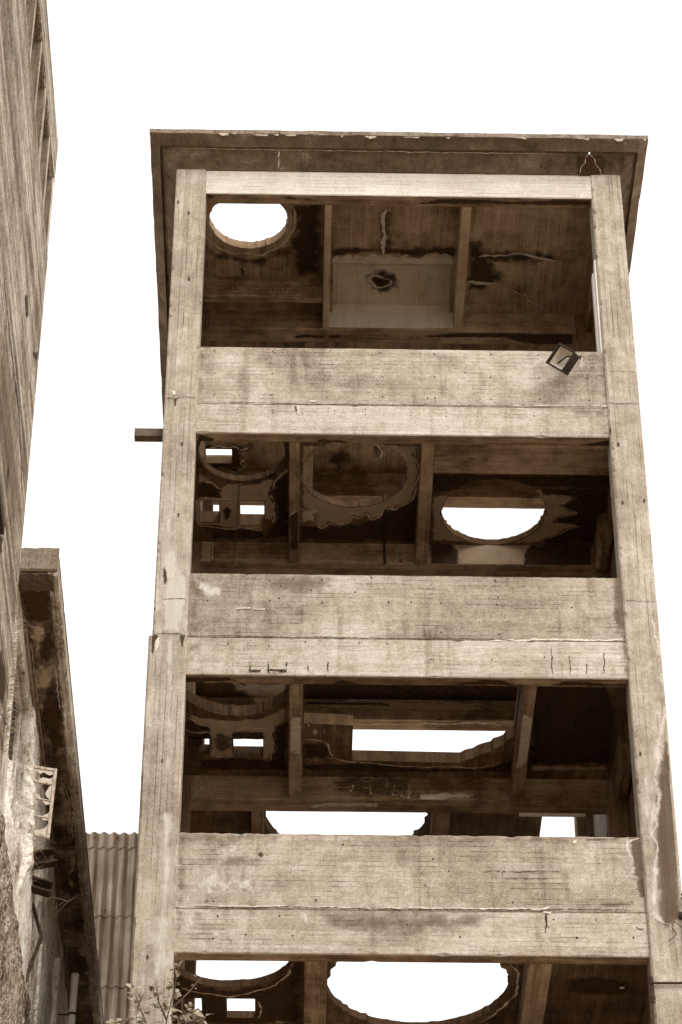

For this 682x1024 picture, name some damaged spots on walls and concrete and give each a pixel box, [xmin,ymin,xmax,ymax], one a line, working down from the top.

damp [206,197,573,345]
crack [465,280,547,311]
damp [40,634,53,660]
damp [41,692,62,758]